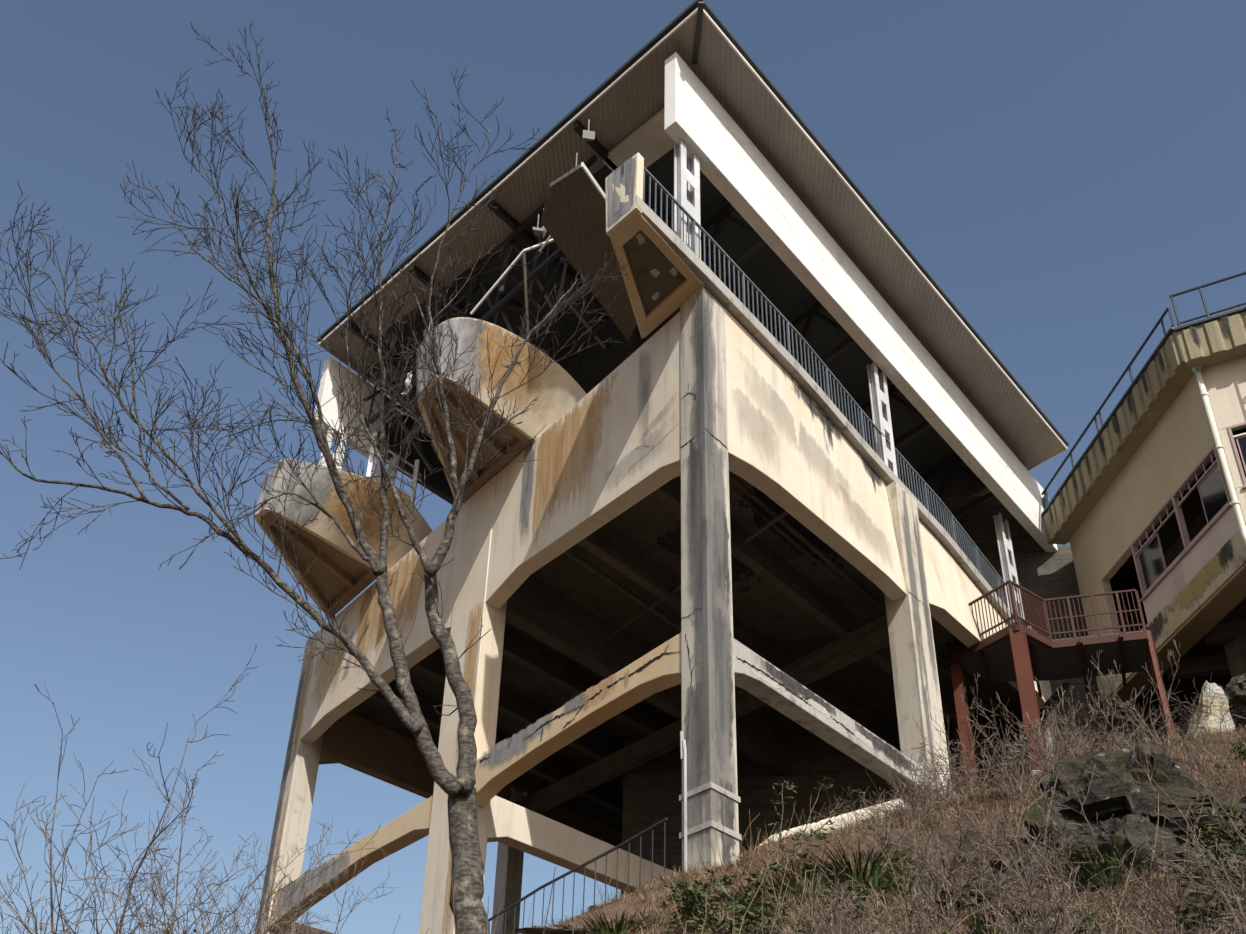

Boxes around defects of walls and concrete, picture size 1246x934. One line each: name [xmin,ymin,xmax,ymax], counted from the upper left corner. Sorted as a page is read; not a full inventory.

corrosion [475,321,549,400]
corrosion [328,471,403,535]
corrosion [533,380,608,532]
damp [795,385,841,445]
damp [862,460,881,488]
damp [686,289,733,852]
corrosion [295,543,424,750]
corrosion [464,608,481,697]
crack [480,608,698,762]
crack [736,656,854,735]